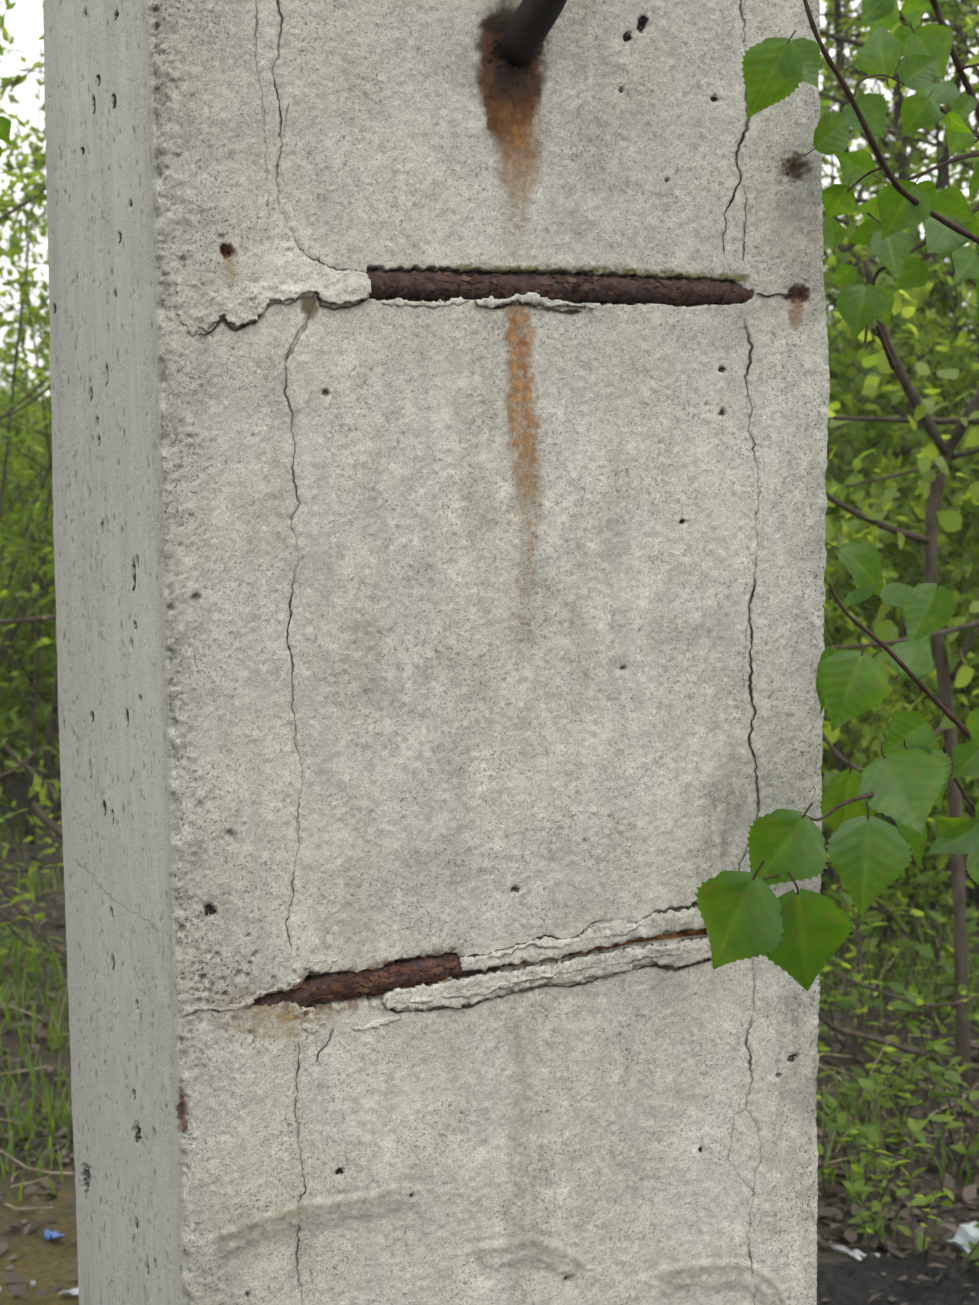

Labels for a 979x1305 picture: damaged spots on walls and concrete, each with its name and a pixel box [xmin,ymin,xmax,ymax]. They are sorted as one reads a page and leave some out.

crack [255,0,284,171]
corrosion [477,9,544,193]
crack [722,92,750,262]
spalling [175,242,754,336]
crack [284,345,301,532]
corrosion [507,309,539,469]
crack [744,332,761,509]
crack [286,586,296,728]
crack [748,576,760,821]
corrosion [254,947,462,1031]
peeling [182,906,712,1034]
crack [745,1027,753,1086]